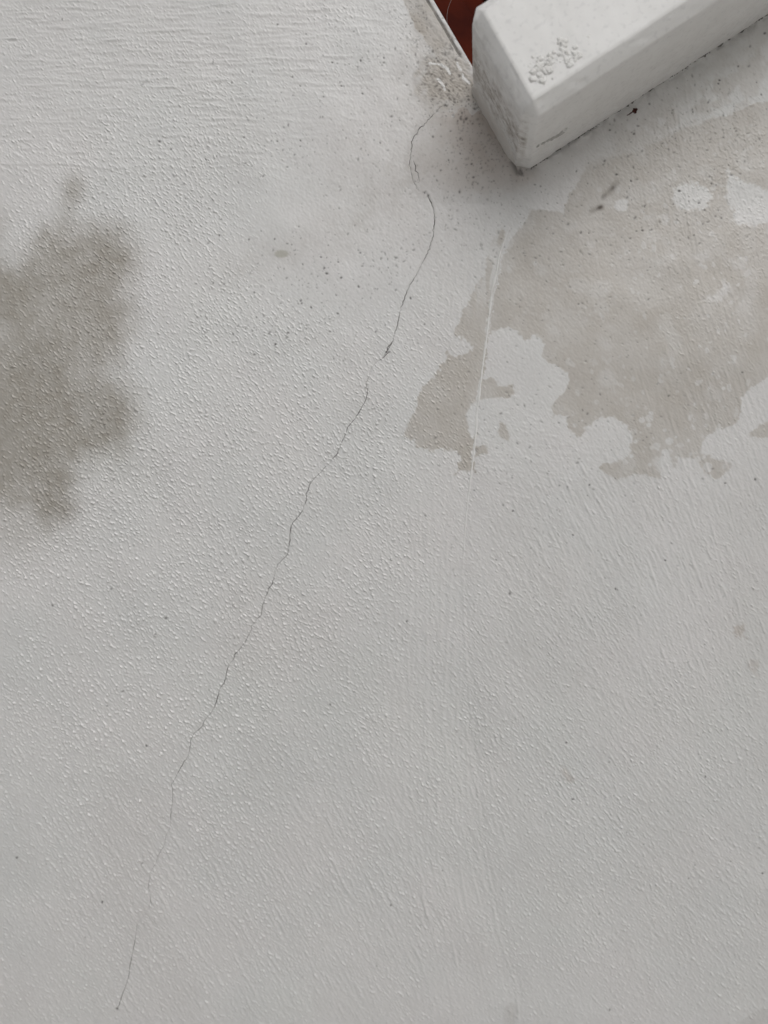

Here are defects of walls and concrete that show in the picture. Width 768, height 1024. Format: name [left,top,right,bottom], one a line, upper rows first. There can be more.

crack [382,110,438,359]
leakage [402,29,768,481]